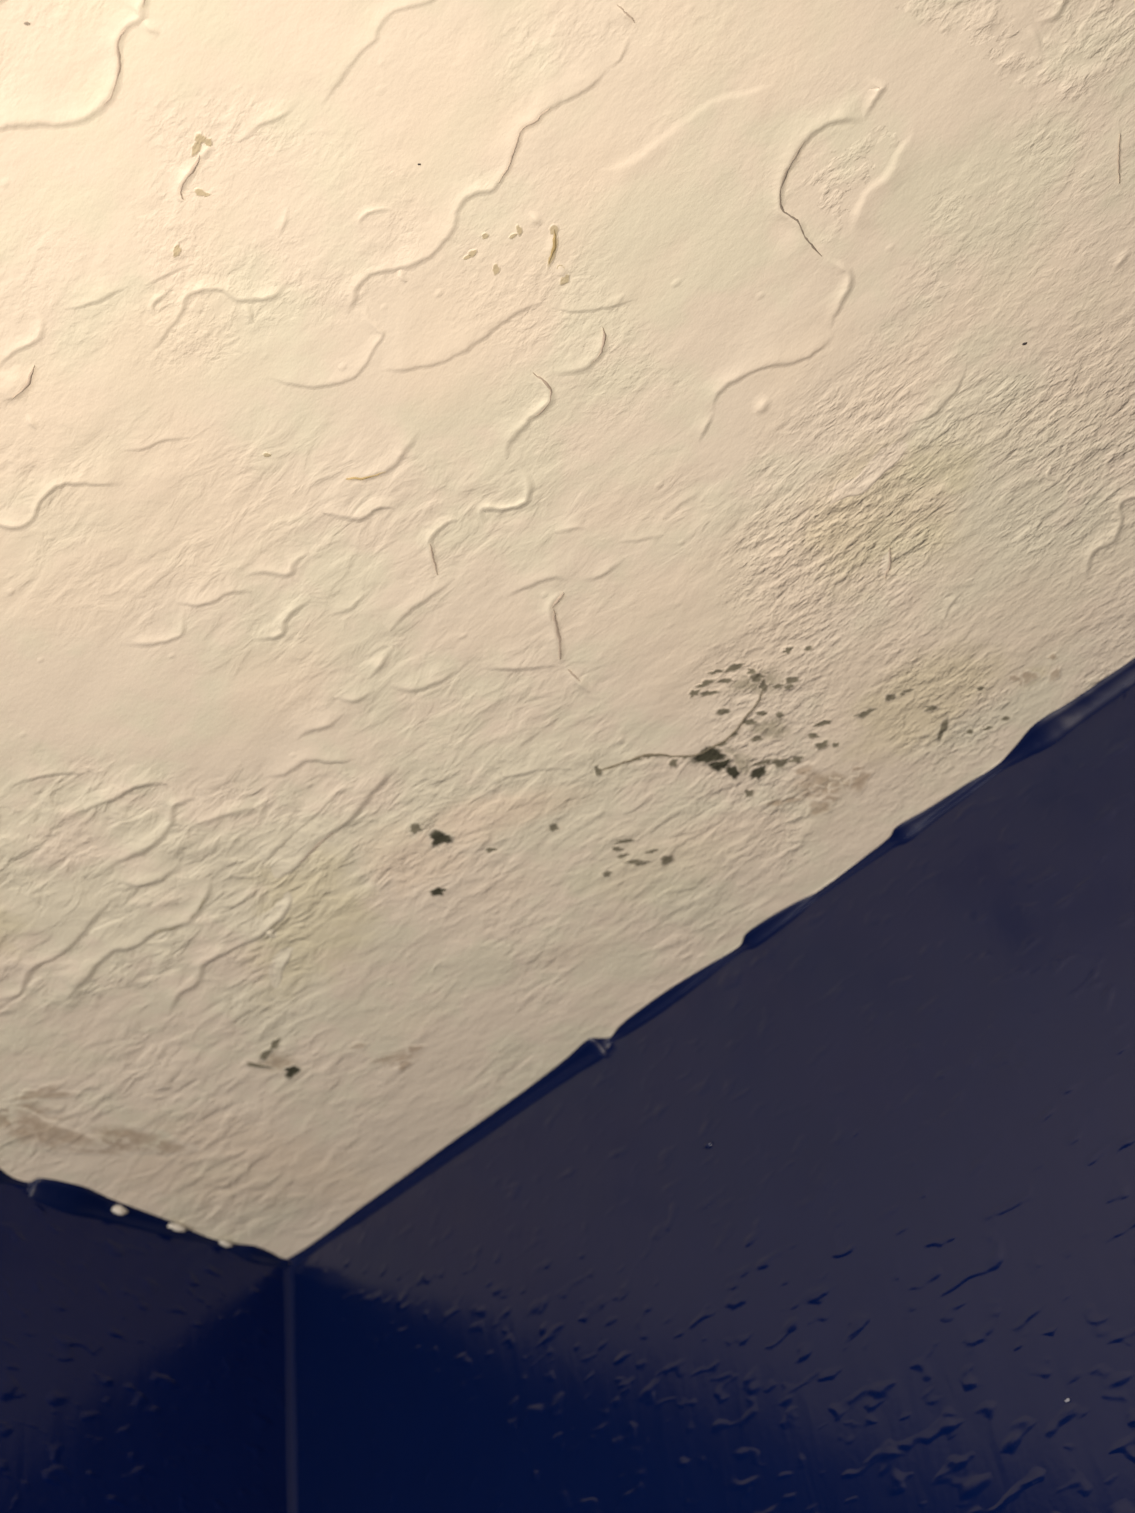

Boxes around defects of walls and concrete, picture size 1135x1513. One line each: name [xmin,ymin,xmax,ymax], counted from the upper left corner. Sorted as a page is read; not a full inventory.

leakage [0,397,1068,1230]